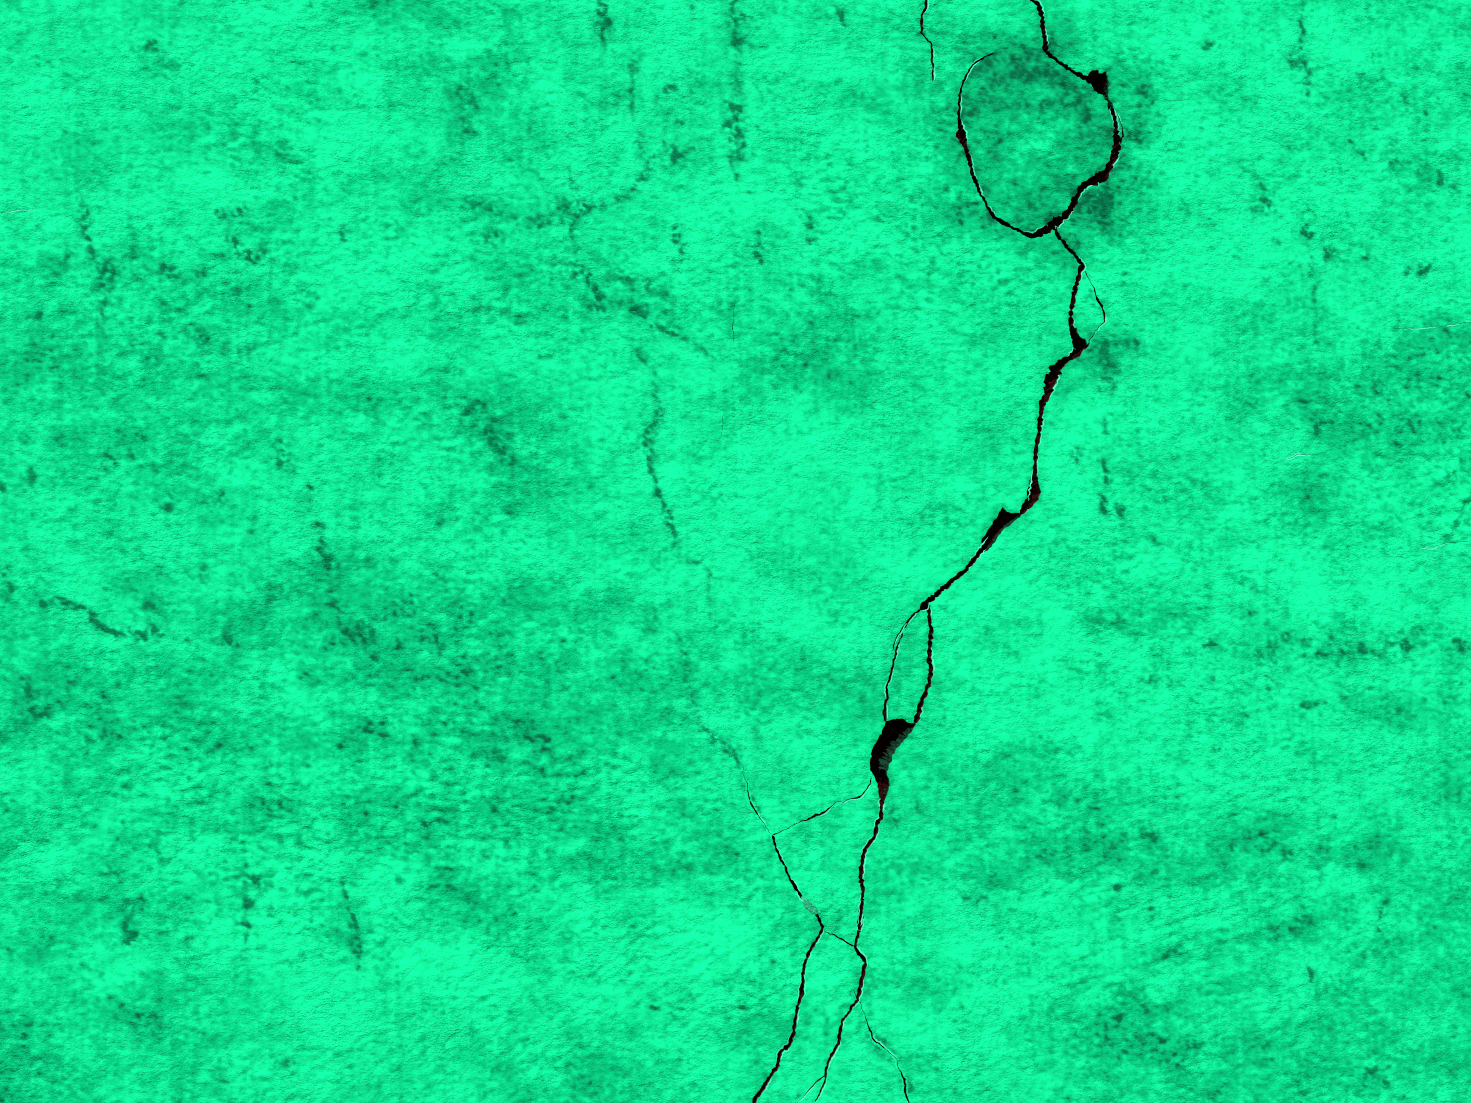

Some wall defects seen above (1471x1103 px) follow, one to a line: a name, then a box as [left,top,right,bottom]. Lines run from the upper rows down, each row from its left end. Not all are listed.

crack [882,0,1185,724]
crack [742,765,910,1103]